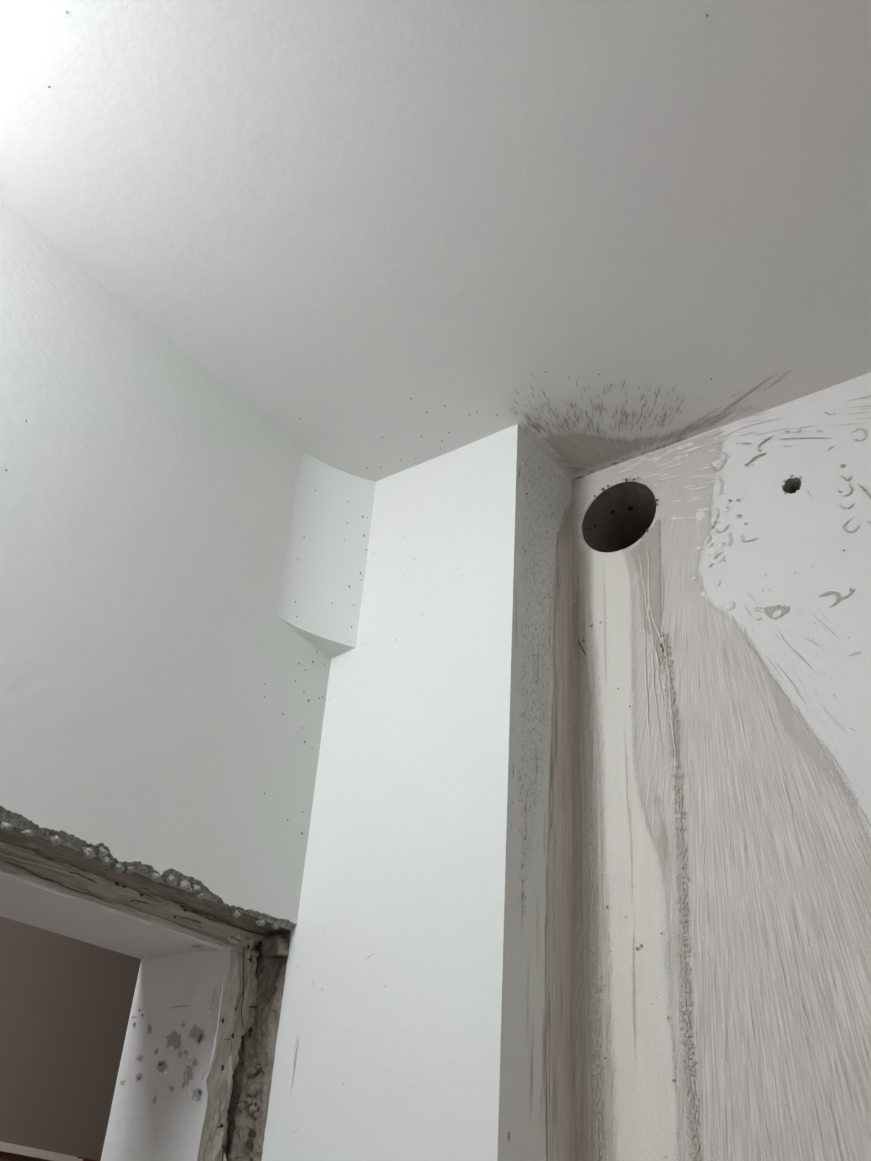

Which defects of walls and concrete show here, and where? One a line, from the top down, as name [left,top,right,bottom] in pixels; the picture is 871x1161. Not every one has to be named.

peeling [0,805,296,1161]
leakage [510,370,792,1161]
flaking render [571,428,871,1161]